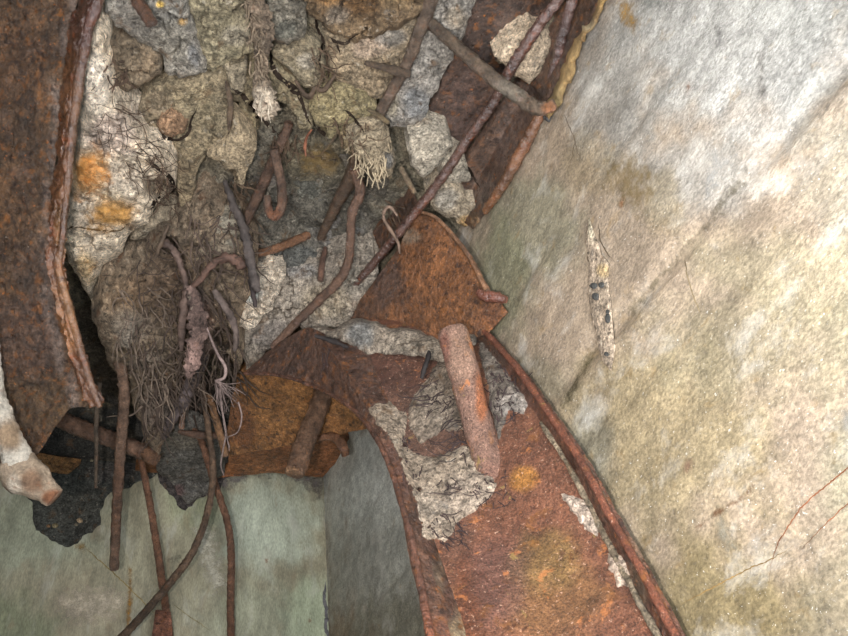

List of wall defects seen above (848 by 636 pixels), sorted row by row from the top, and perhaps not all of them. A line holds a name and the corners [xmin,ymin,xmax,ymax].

spalling [28,0,578,636]
spalling [585,218,615,370]